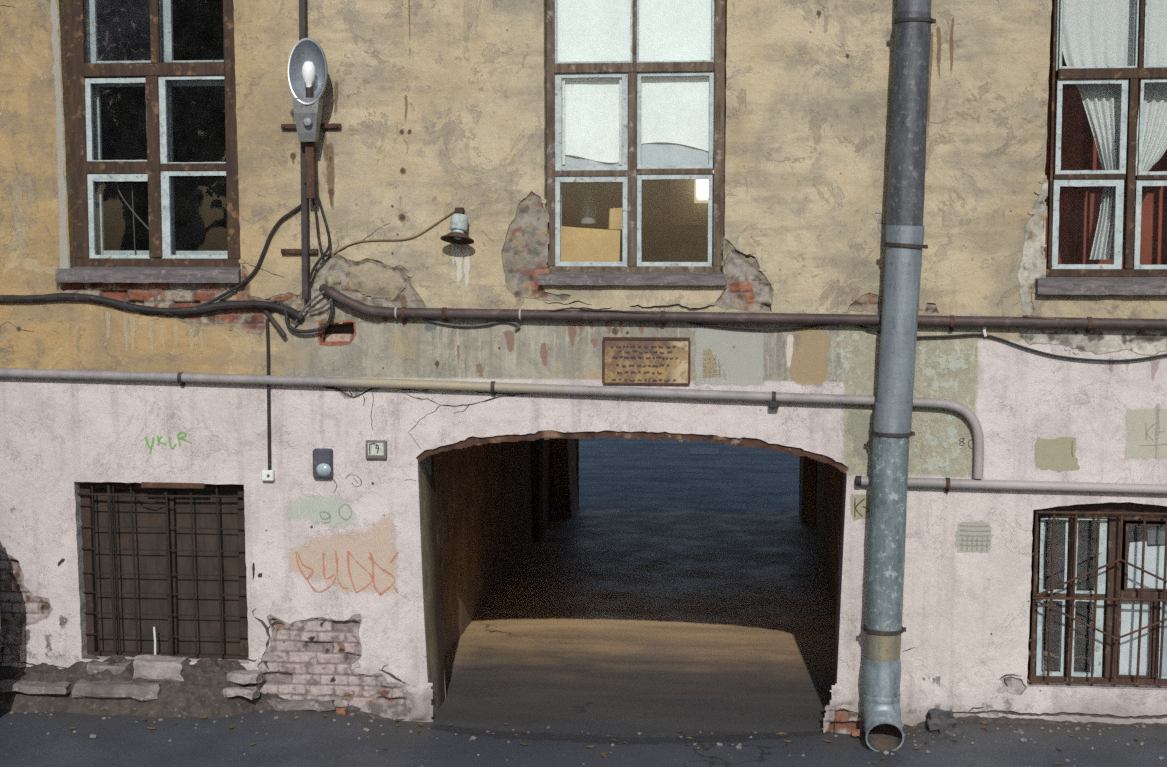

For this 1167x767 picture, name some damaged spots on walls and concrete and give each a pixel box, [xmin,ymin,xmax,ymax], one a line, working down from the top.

spalling [48,0,427,346]
spalling [501,190,571,304]
spalling [713,236,774,312]
flaking render [1015,176,1167,356]
crack [323,386,527,449]
spalling [0,550,53,666]
spalling [256,613,416,711]